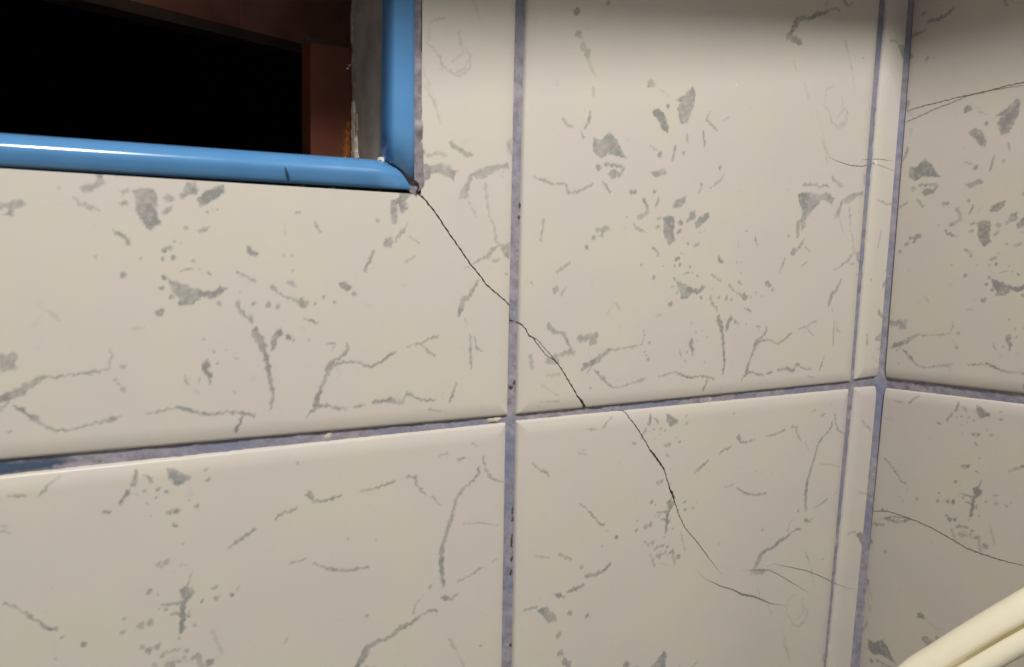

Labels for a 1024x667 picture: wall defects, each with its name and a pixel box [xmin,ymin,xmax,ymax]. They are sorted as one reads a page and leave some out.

crack [396,167,853,605]
crack [874,510,1024,566]